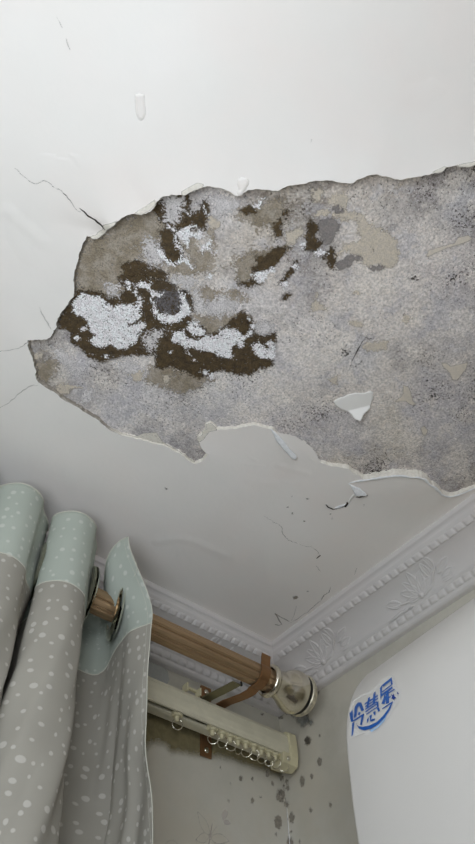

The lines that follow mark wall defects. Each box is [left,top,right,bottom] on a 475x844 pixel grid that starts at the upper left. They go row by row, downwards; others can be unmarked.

crack [51,184,105,230]
damp [37,188,337,406]
spalling [27,162,475,496]